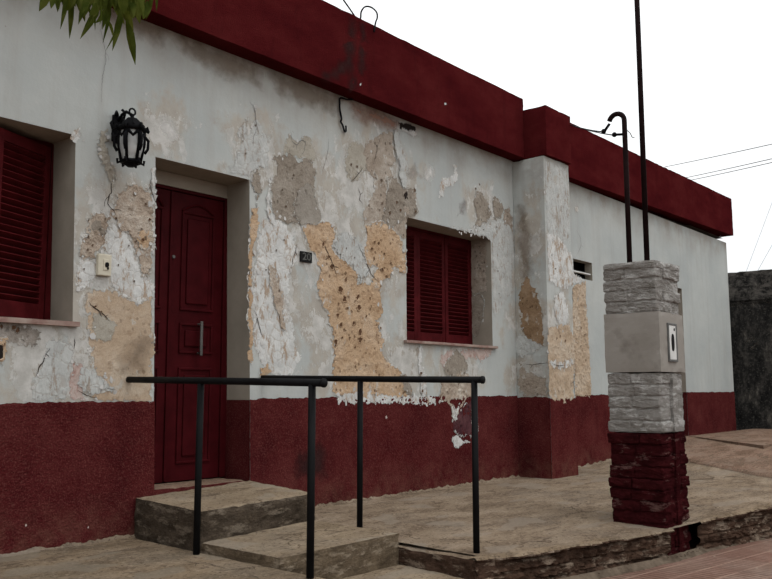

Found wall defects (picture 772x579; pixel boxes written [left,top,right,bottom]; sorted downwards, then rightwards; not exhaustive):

spalling [0,129,158,403]
spalling [229,104,493,448]
peeling [450,161,592,403]